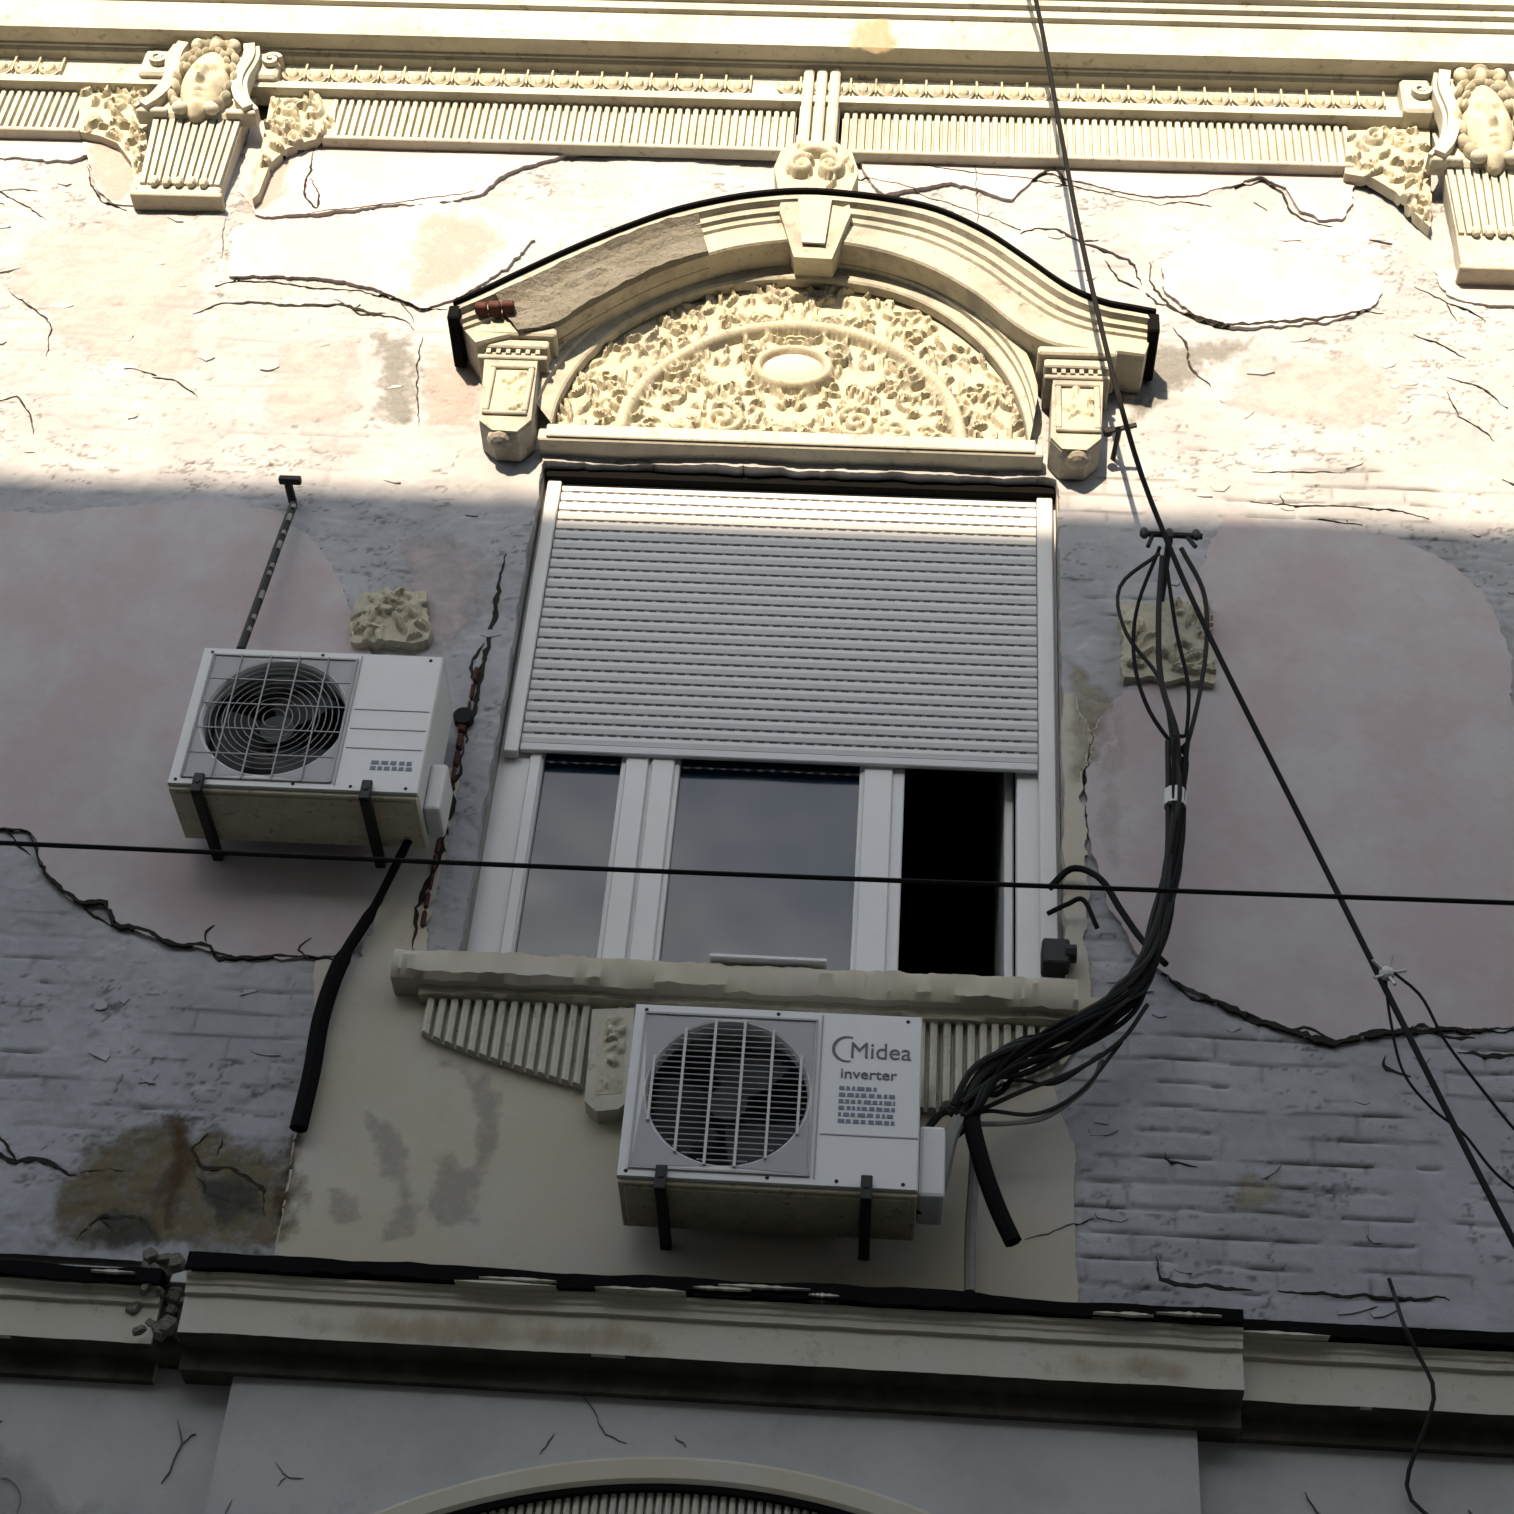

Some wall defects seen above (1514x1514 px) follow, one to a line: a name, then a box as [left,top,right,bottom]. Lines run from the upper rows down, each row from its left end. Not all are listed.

crack [303,150,475,213]
crack [9,291,53,355]
crack [124,368,198,398]
crack [193,217,448,426]
crack [858,163,1383,387]
crack [1413,287,1514,442]
spalling [0,130,1514,958]
crack [1250,471,1428,526]
spalling [1083,838,1137,998]
spalling [0,831,316,1263]
water stain [56,1118,300,1247]
spalling [1053,971,1514,1332]